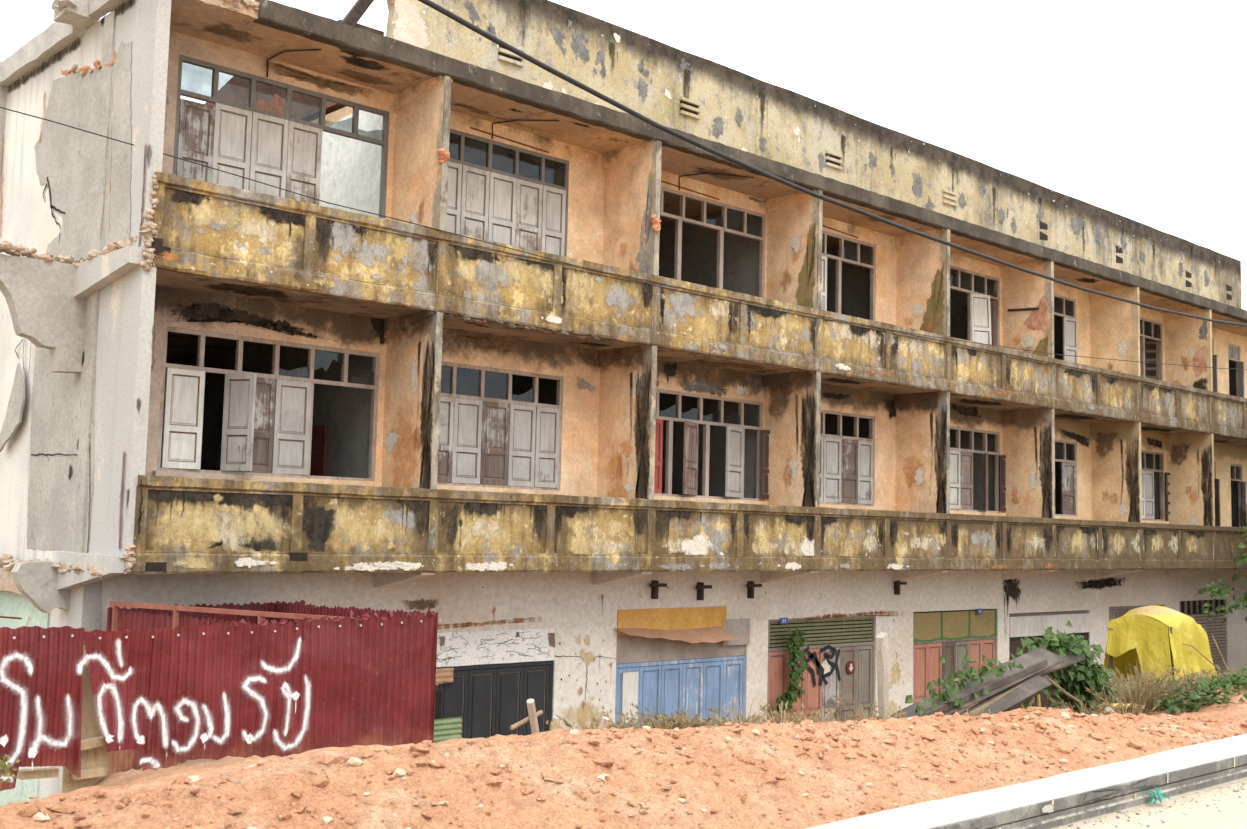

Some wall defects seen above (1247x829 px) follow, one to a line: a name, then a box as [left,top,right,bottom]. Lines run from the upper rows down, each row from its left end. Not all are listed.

peeling [465,0,499,49]
peeling [550,19,606,78]
peeling [638,58,671,101]
peeling [712,108,744,138]
peeling [912,172,936,210]
water stain [454,245,500,267]
water stain [517,258,577,307]
water stain [643,284,665,323]
water stain [728,303,788,338]
water stain [850,325,898,357]
water stain [530,504,589,551]
peeling [660,516,730,571]